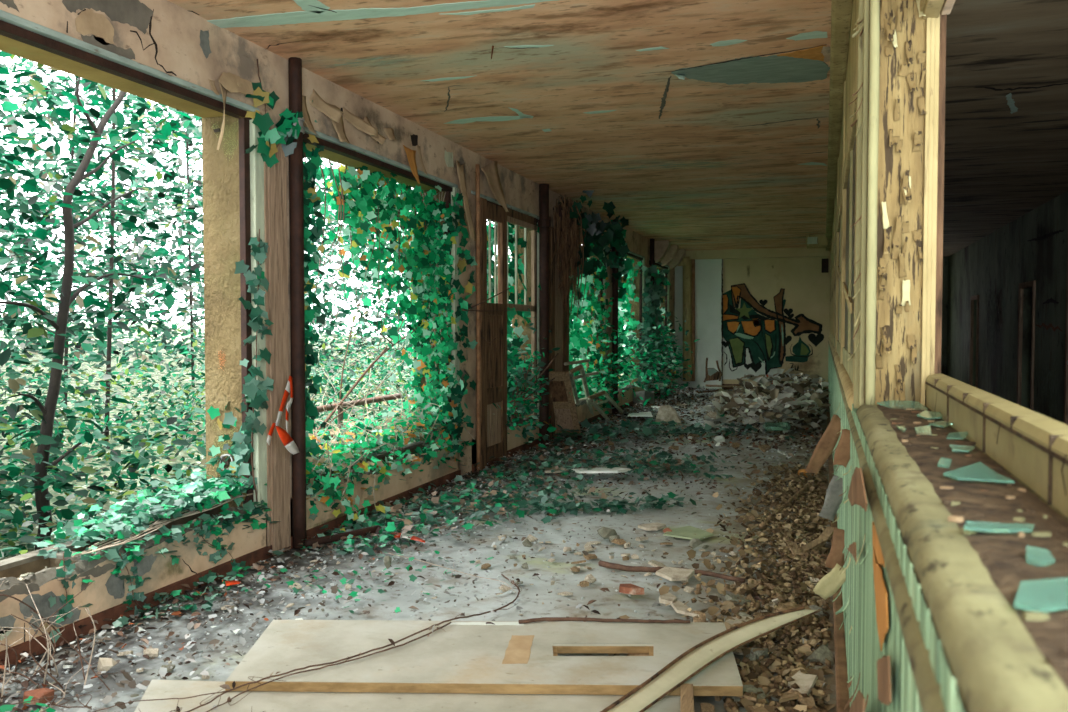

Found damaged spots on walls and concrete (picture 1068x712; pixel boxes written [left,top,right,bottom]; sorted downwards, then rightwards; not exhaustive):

peeling [62,0,153,59]
crack [130,9,177,76]
flaking render [200,0,558,59]
peeling [880,0,927,153]
peeling [877,170,923,314]
peeling [876,325,938,449]
peeling [0,554,157,641]
peeling [681,404,892,712]